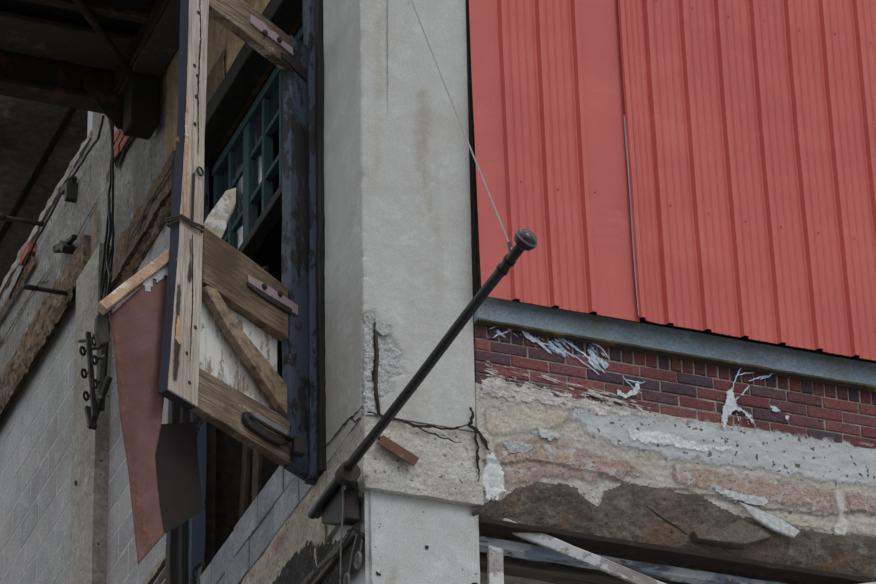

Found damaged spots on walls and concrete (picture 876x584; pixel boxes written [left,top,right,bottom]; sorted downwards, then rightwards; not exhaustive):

spalling [361,311,404,416]
crack [325,406,491,482]
spalling [472,428,876,578]